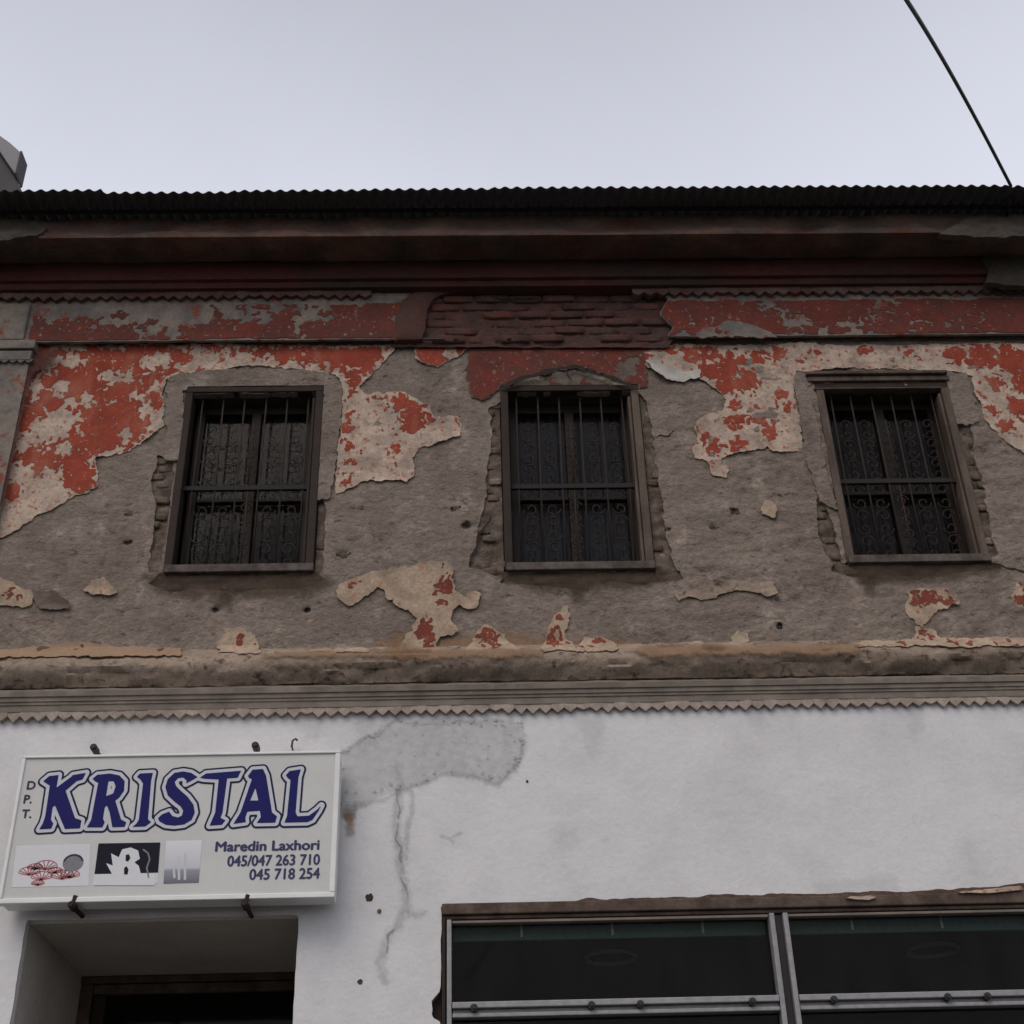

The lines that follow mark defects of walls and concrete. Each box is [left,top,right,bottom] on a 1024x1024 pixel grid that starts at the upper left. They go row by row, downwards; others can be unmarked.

peeling [0,213,1024,601]
spalling [816,426,1024,649]
peeling [0,577,70,610]
peeling [336,561,481,648]
peeling [464,605,618,653]
crack [395,795,408,902]